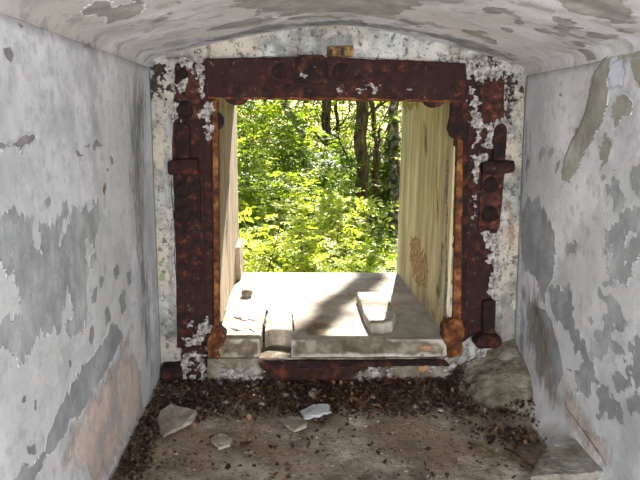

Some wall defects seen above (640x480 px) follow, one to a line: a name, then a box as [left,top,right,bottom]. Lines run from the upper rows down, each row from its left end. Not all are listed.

peeling [79,0,147,27]
peeling [205,0,466,31]
peeling [482,7,524,34]
peeling [171,78,188,122]
peeling [437,52,521,157]
peeling [0,131,37,154]
peeling [519,0,640,425]
peeling [113,265,132,315]
peeling [0,196,123,480]
peeling [178,315,266,384]
corrosion [259,362,369,384]
corrosion [418,345,432,372]